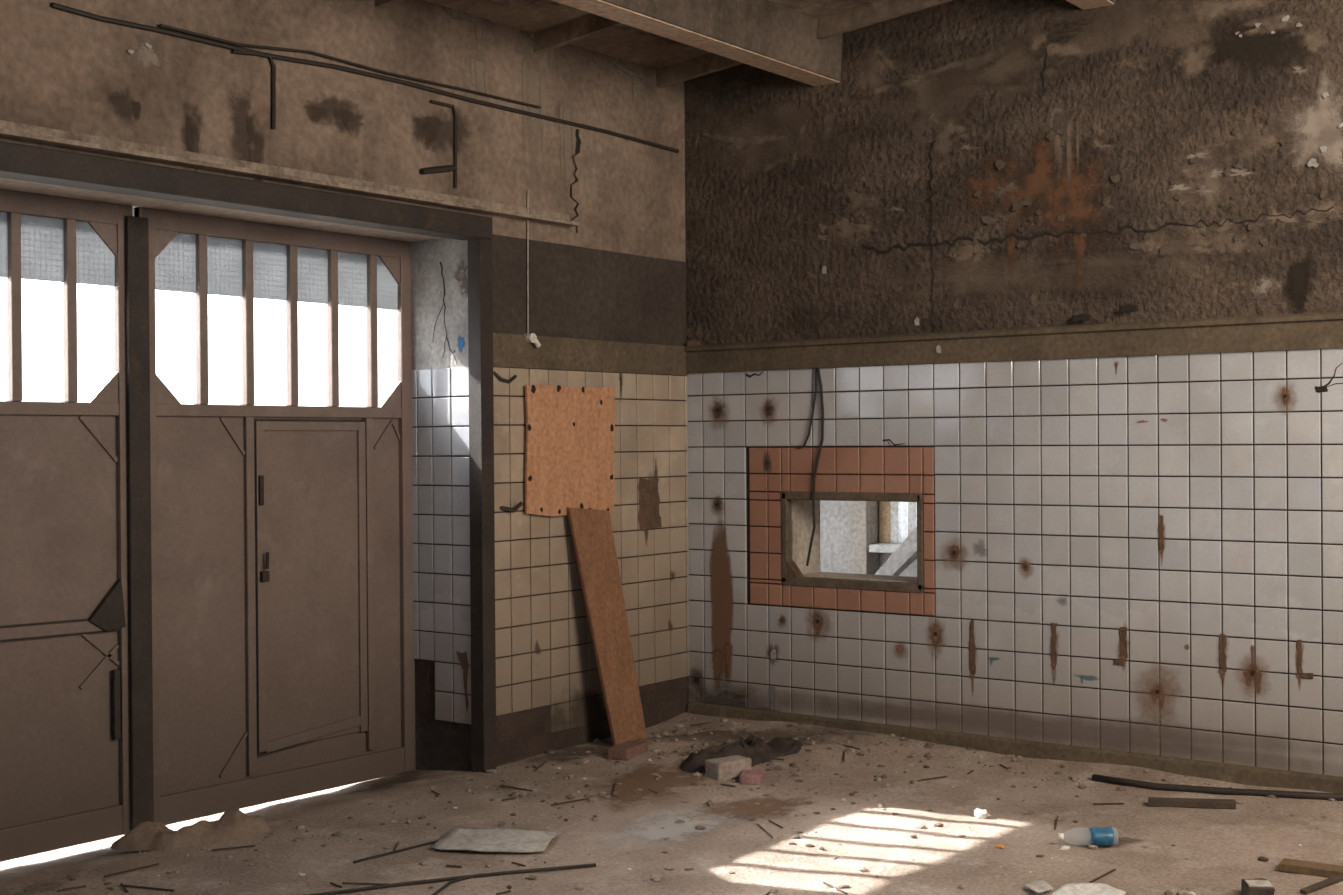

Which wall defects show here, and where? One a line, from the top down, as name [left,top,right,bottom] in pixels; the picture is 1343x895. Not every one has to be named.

damp [182,109,201,153]
damp [232,98,264,182]
damp [306,99,362,131]
damp [415,112,467,152]
flaking render [1117,78,1343,256]
crack [864,142,1334,333]
corrosion [946,545,964,565]
corrosion [1242,646,1262,691]
corrosion [1145,677,1176,712]